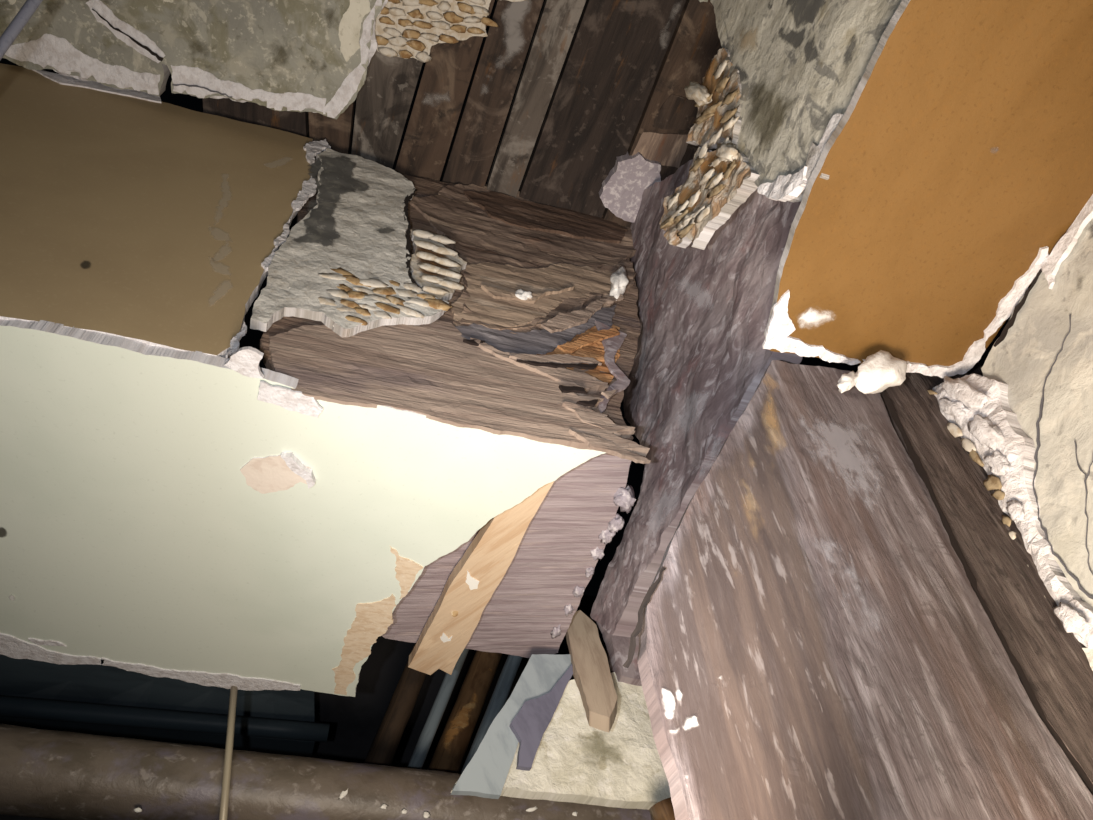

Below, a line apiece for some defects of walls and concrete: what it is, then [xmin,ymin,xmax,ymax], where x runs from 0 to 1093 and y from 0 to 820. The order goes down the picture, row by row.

peeling [779,0,826,62]
peeling [844,38,855,63]
flaking render [250,148,467,338]
flaking render [659,48,844,250]
flaking render [927,373,1093,671]
crack [1032,314,1093,599]
peeling [662,689,682,718]